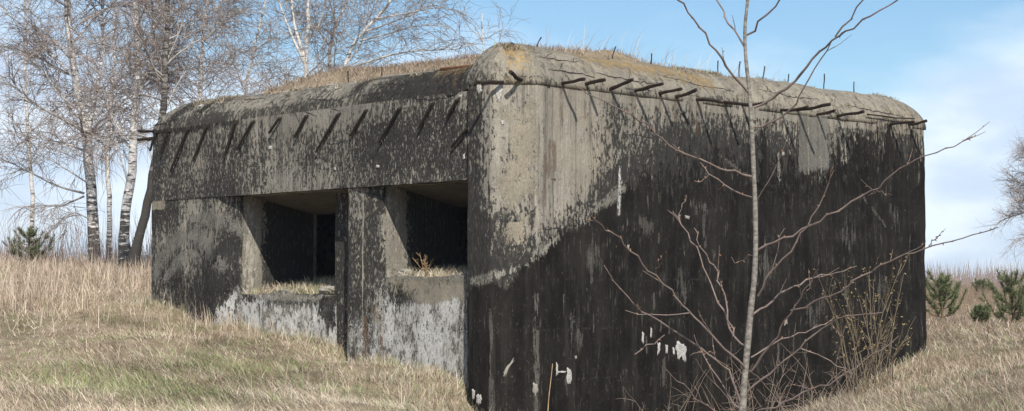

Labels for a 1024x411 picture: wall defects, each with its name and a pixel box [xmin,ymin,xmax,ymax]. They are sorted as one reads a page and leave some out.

leakage [153,99,239,136]
leakage [151,112,927,411]
peeling [642,328,687,362]
peeling [556,356,577,384]